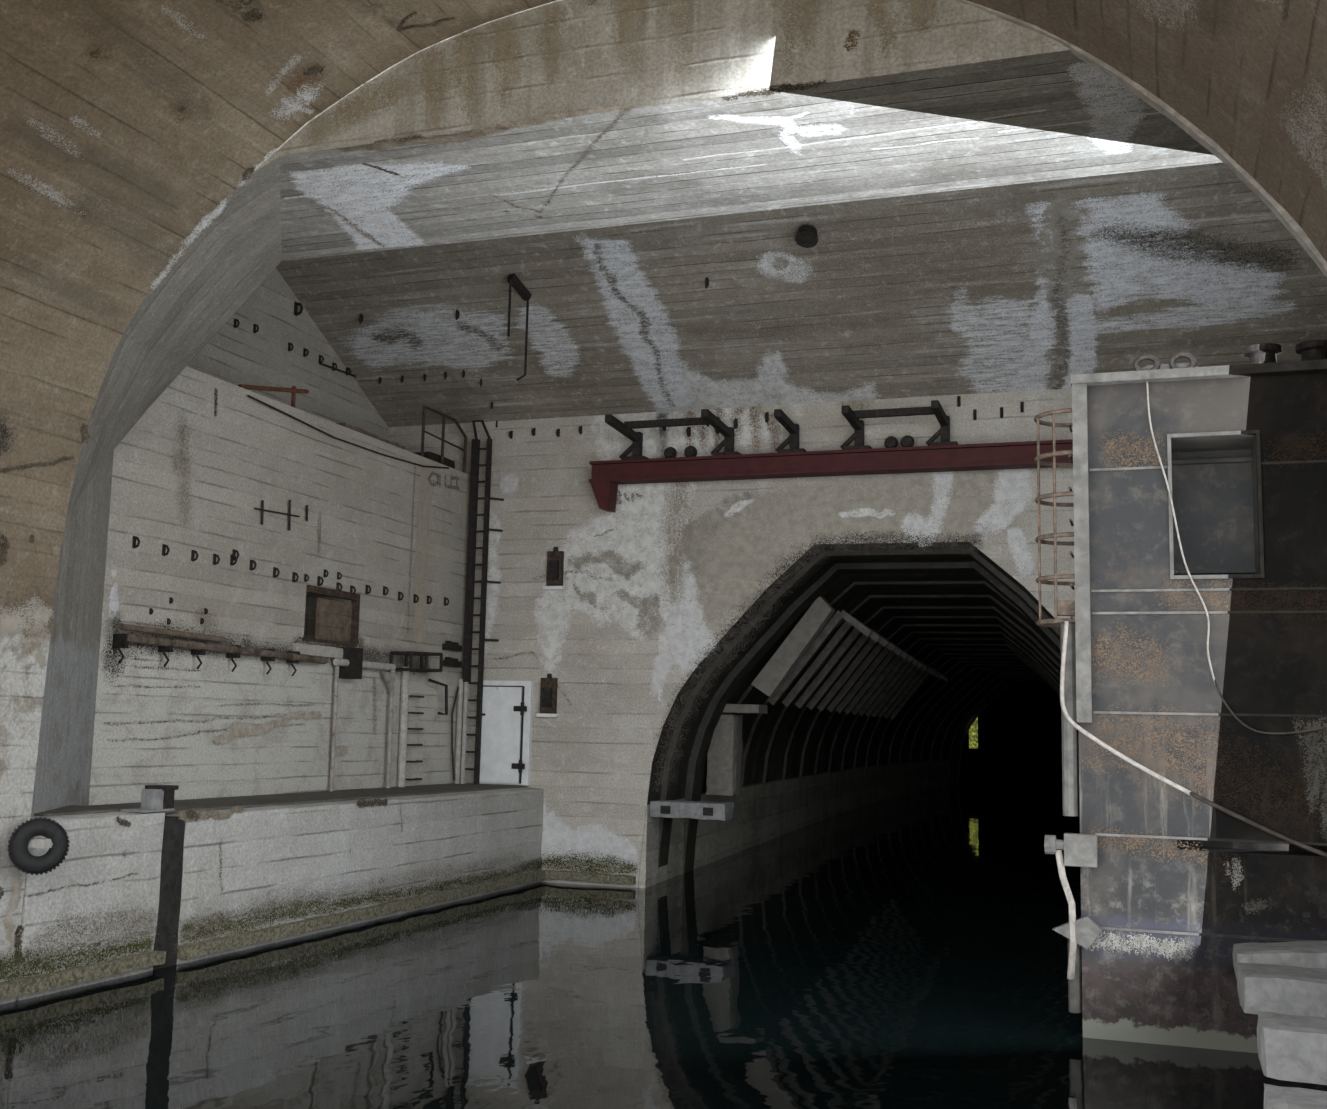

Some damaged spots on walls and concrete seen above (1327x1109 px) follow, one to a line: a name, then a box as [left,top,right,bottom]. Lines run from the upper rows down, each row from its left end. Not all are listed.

leakage [268,3,567,150]
leakage [583,0,705,89]
leakage [843,0,943,61]
leakage [575,185,1303,412]
rust [1153,571,1327,624]
rust [1091,622,1177,688]
rust [1080,702,1327,841]
rust [1087,826,1239,872]
rust [1079,930,1196,961]